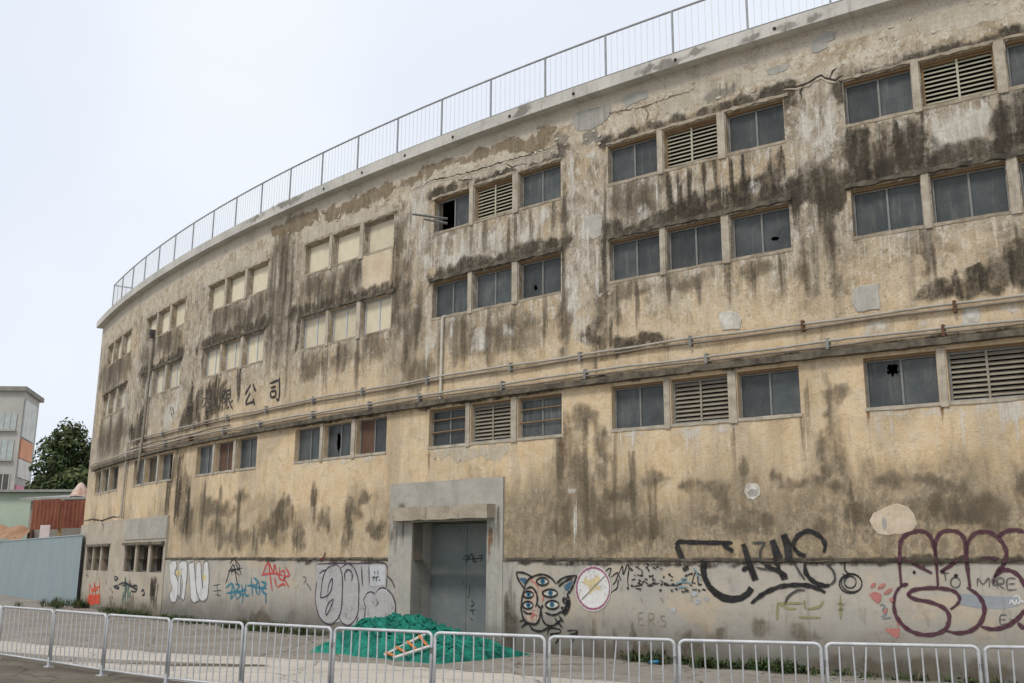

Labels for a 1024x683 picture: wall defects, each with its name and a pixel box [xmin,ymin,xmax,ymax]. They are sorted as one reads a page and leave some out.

crack [784,67,843,99]
water stain [895,25,1023,65]
peeling [271,126,569,243]
water stain [196,78,1024,391]
water stain [160,369,346,565]
water stain [346,492,381,538]
water stain [554,405,659,547]
water stain [815,386,872,523]
water stain [910,477,1006,531]